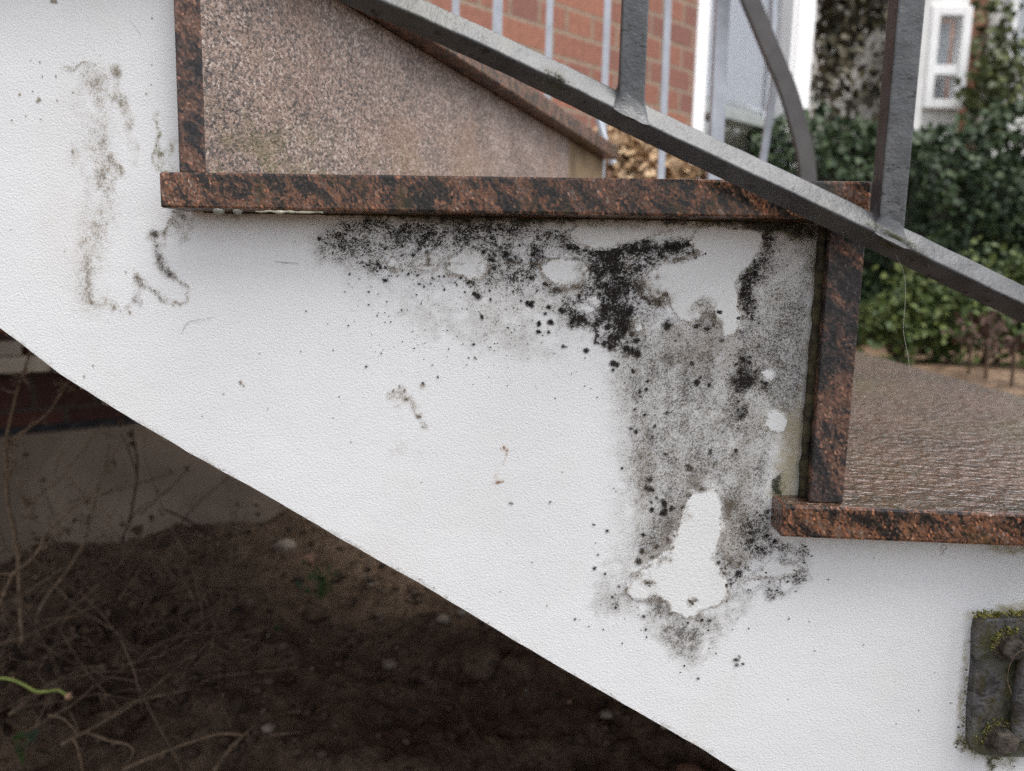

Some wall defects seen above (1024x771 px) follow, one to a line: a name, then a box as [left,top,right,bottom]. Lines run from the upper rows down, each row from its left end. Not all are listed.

damp [64,61,192,313]
damp [317,216,818,673]